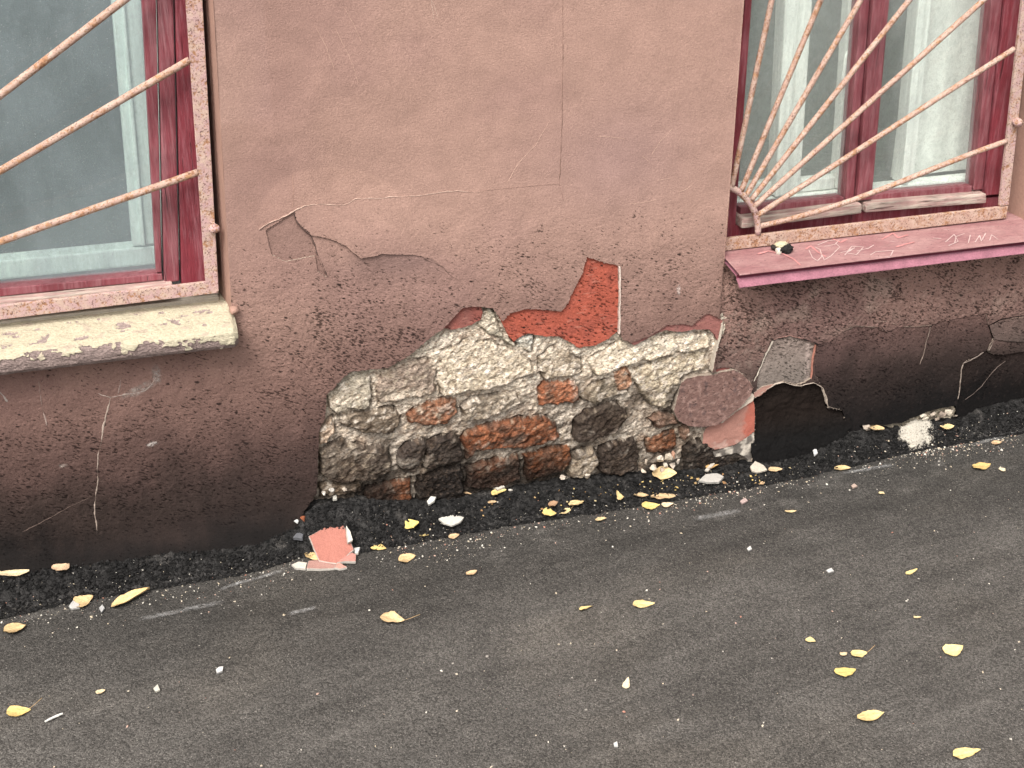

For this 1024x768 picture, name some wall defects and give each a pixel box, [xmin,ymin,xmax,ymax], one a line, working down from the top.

flaking render [266,213,326,276]
peeling [0,309,239,375]
flaking render [311,257,1024,506]
crack [958,317,1024,398]
crack [25,378,156,531]